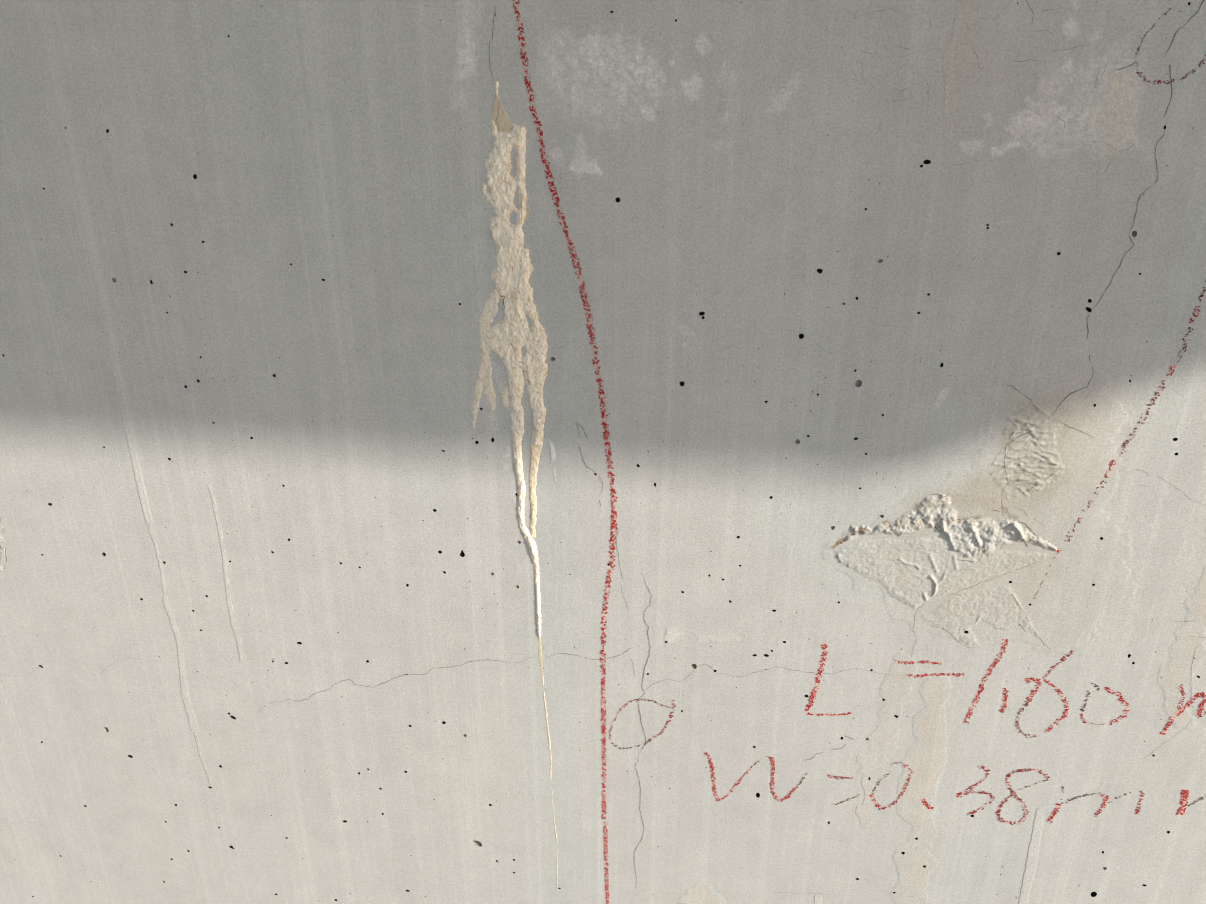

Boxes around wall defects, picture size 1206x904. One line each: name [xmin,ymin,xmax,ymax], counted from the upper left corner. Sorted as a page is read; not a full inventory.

efflorescence [445,0,558,889]
efflorescence [529,16,742,181]
efflorescence [958,0,1159,169]
crack [1004,0,1204,485]